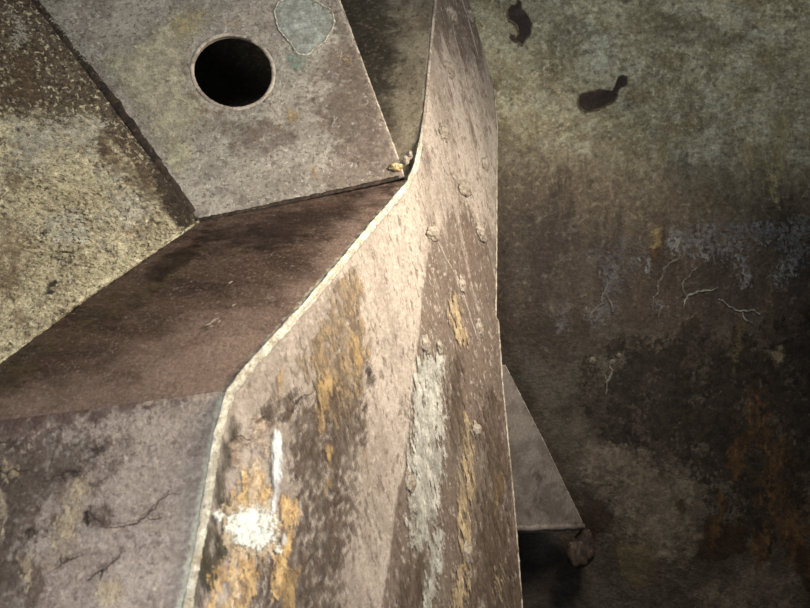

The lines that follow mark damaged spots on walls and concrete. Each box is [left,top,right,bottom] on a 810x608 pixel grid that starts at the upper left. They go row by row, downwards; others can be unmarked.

leakage [668,218,810,288]
crack [652,254,760,323]
corrosion [295,266,372,433]
crack [89,493,181,529]
leakage [246,459,261,508]
leakage [256,386,303,512]
leakage [447,292,476,608]
crack [53,555,80,571]
crack [87,550,126,581]
leakage [397,528,445,608]